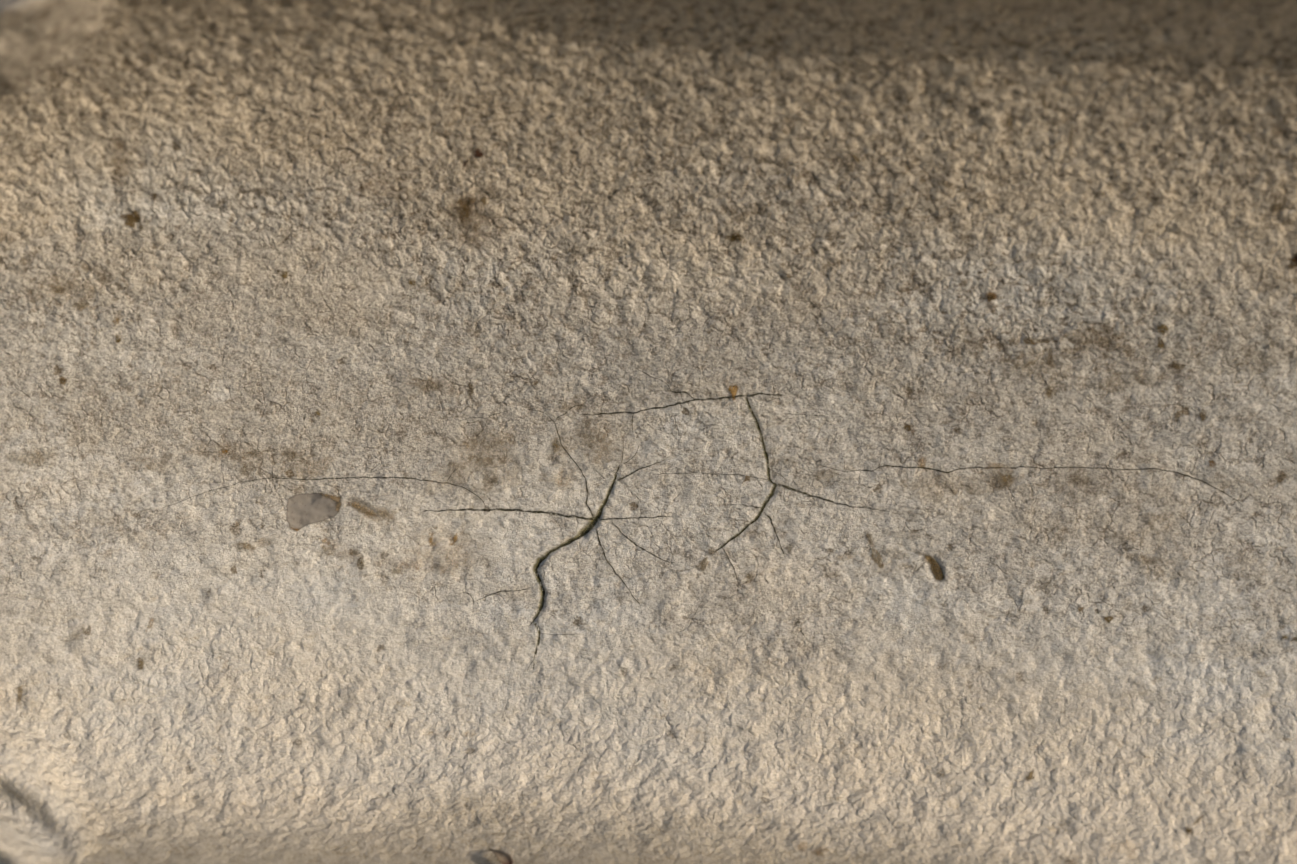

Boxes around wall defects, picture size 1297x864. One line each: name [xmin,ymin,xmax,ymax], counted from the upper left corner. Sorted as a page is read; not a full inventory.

crack [163,370,1242,668]